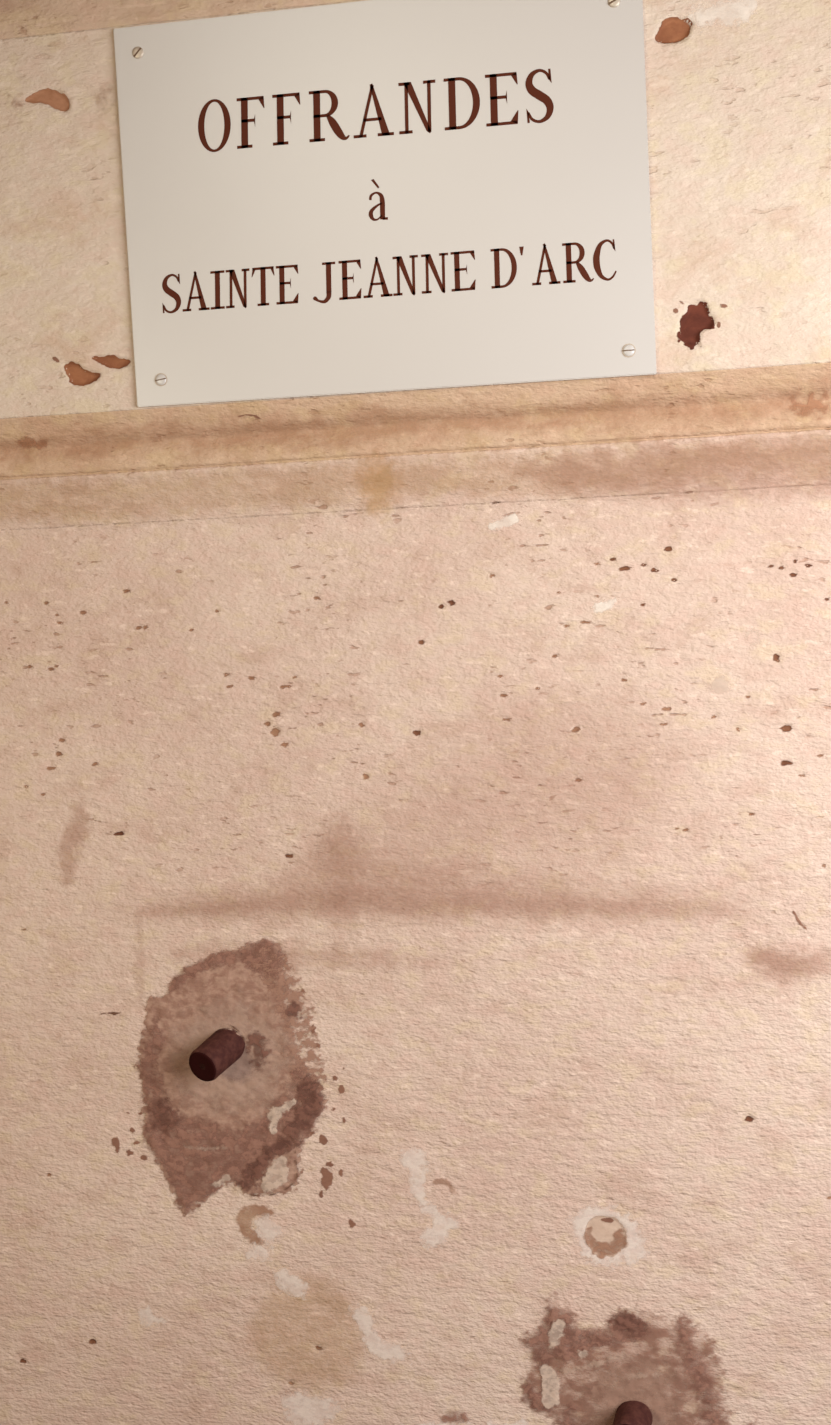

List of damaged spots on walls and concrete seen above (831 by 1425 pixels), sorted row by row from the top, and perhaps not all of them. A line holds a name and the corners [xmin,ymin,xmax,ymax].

spalling [655,0,757,44]
spalling [25,88,70,112]
spalling [52,355,131,386]